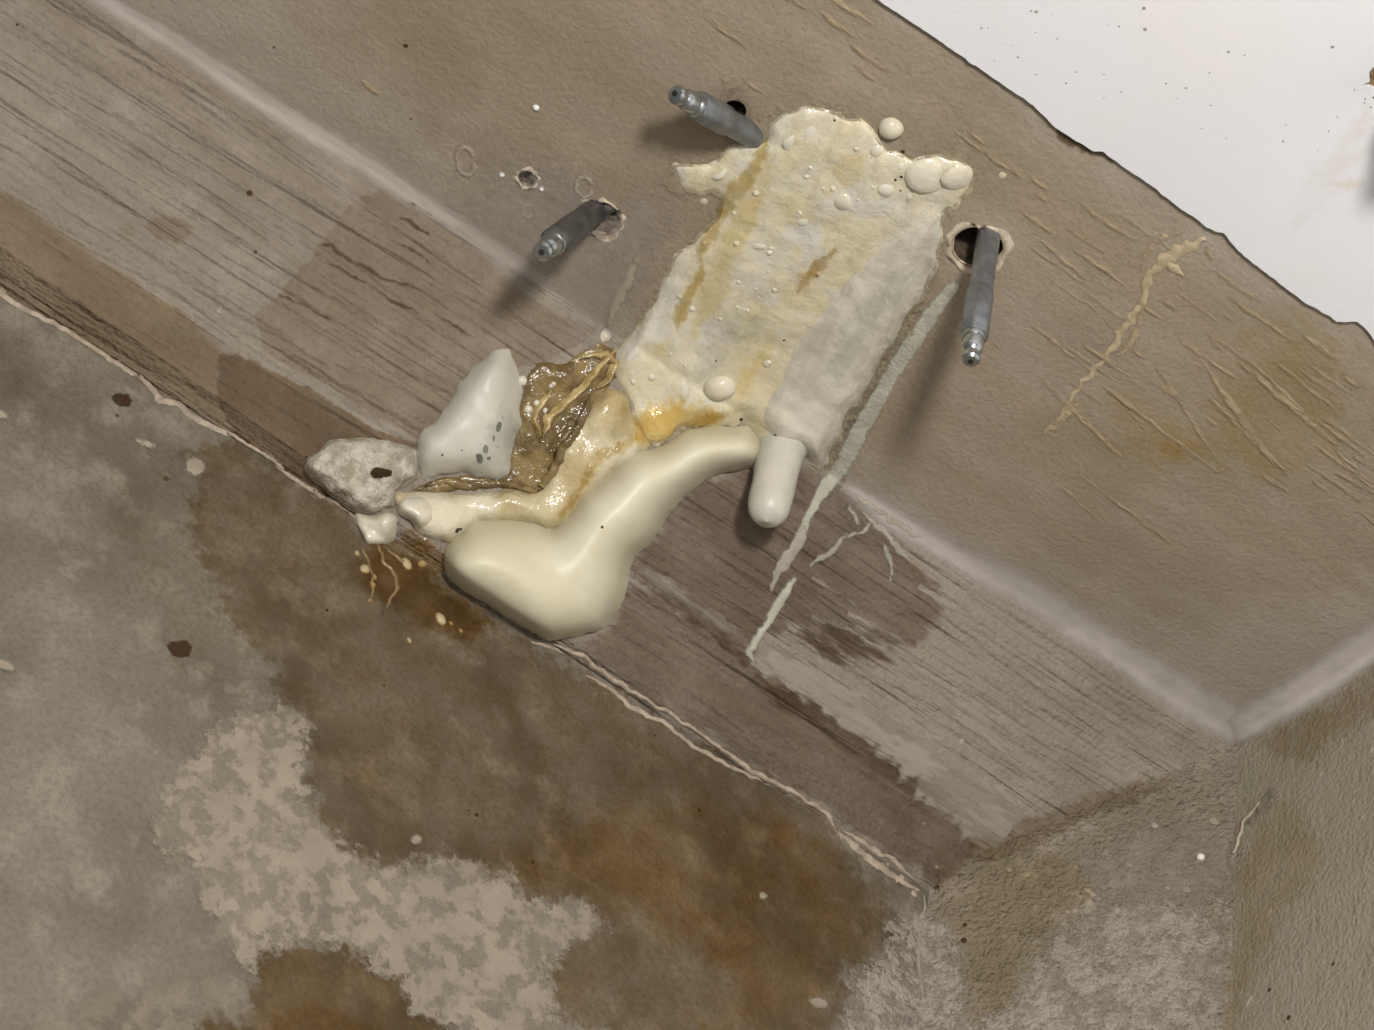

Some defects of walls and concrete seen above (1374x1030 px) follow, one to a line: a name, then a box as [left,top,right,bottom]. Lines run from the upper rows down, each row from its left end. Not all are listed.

crack [323,203,475,338]
crack [0,287,355,518]
efflorescence [152,701,610,1030]
crack [531,641,926,1030]
leakage [750,647,1022,840]
efflorescence [31,974,244,1030]